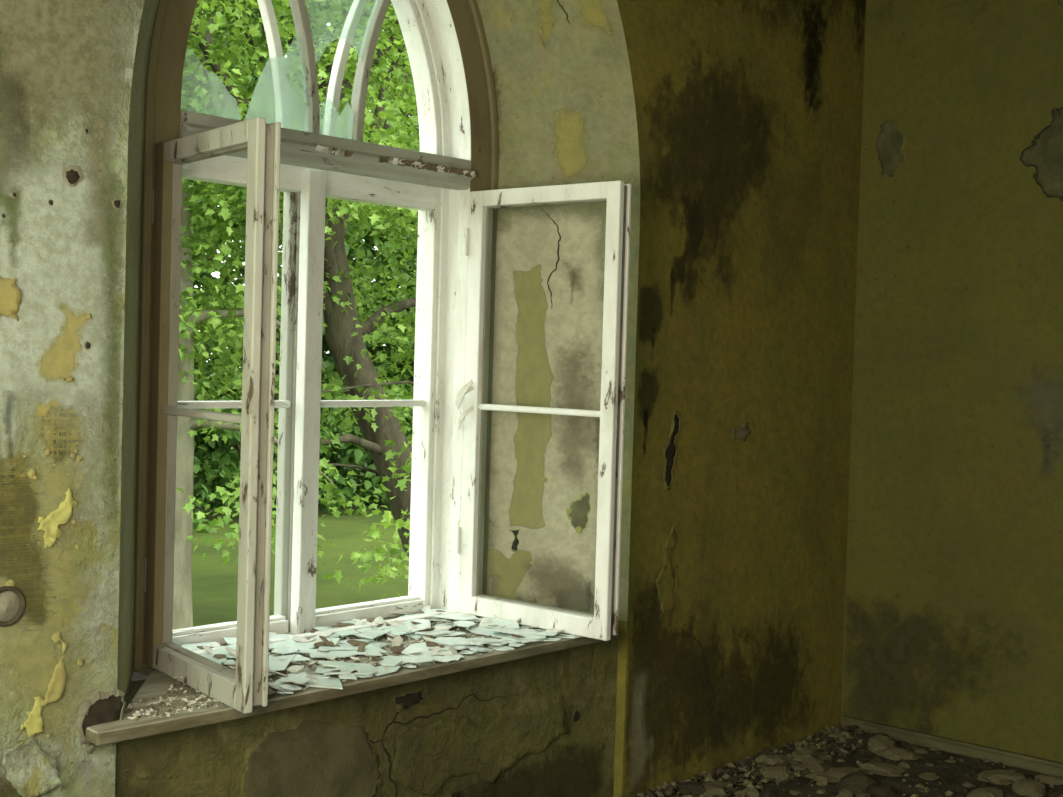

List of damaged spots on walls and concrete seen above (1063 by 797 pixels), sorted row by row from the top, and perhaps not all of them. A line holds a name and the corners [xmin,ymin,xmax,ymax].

leakage [771,0,837,107]
leakage [640,57,770,349]
flaking render [0,115,121,738]
crack [369,693,505,797]
leakage [626,584,804,792]